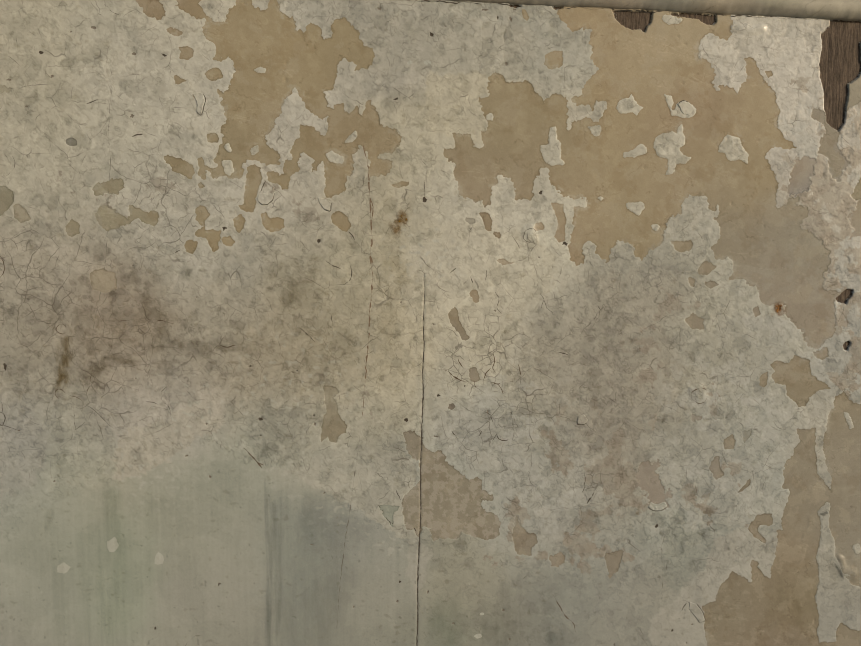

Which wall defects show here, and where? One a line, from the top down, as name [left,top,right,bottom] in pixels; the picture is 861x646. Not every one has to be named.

peeling [0,186,31,223]
peeling [136,0,183,36]
peeling [164,0,409,254]
peeling [443,6,861,646]
peeling [379,418,501,542]
crack [378,282,521,645]